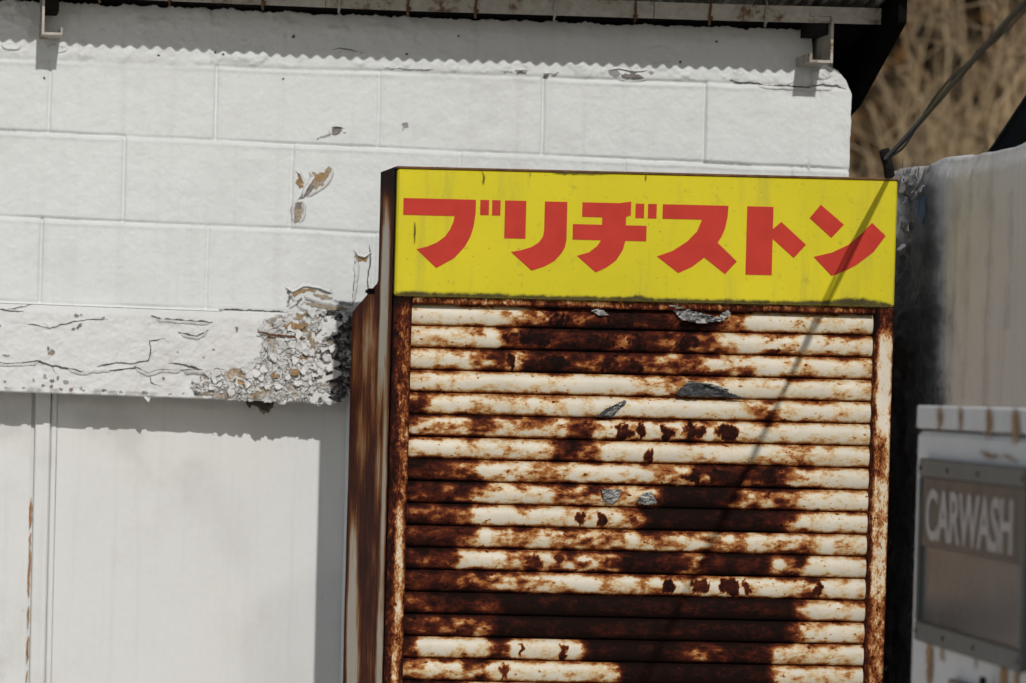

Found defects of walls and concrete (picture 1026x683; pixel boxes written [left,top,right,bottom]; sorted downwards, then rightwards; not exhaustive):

peeling [290,166,334,223]
crack [0,304,103,329]
crack [0,308,286,386]
spalling [168,282,352,414]
damp [883,168,938,683]